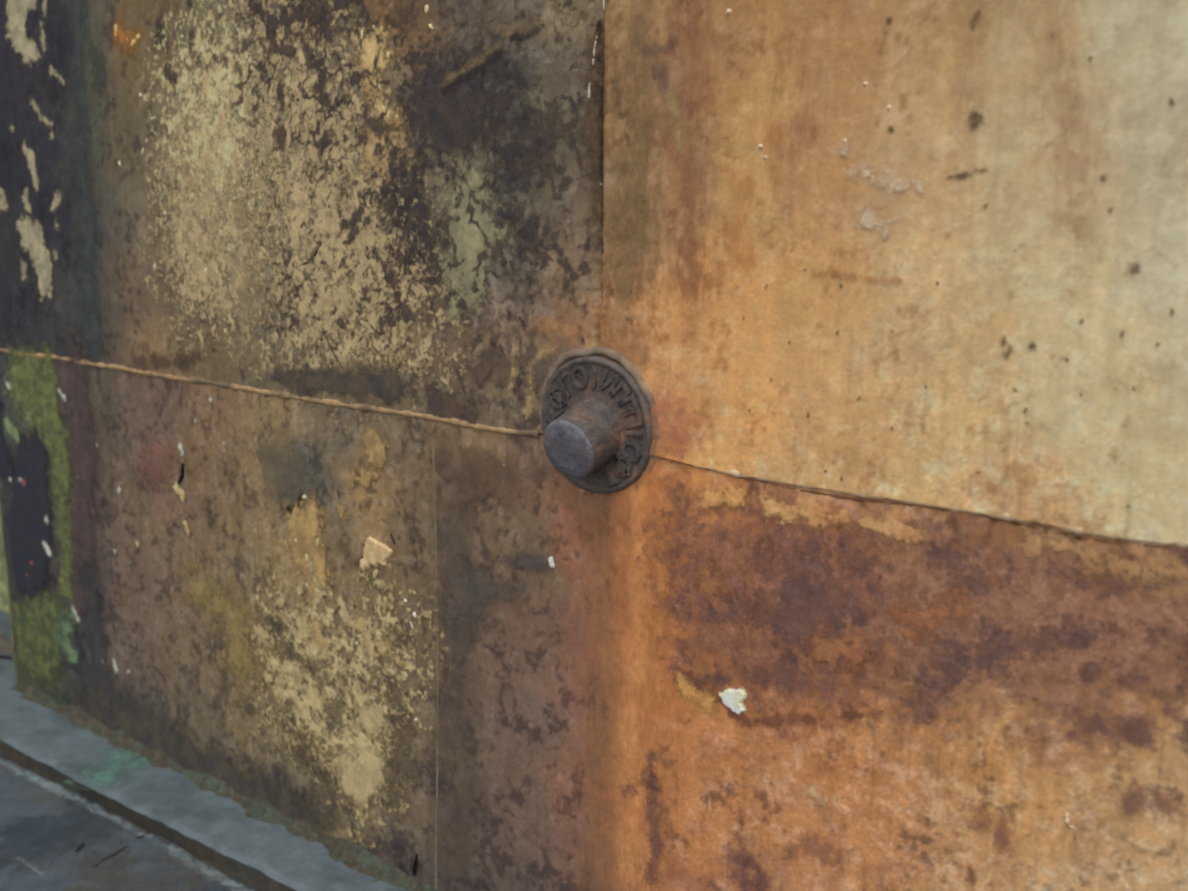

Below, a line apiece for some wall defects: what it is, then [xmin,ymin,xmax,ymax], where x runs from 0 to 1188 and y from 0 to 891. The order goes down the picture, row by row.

peeling [5,0,65,85]
peeling [30,99,54,140]
peeling [0,187,8,215]
peeling [16,141,62,302]
leakage [223,0,606,425]
rust [591,465,677,891]